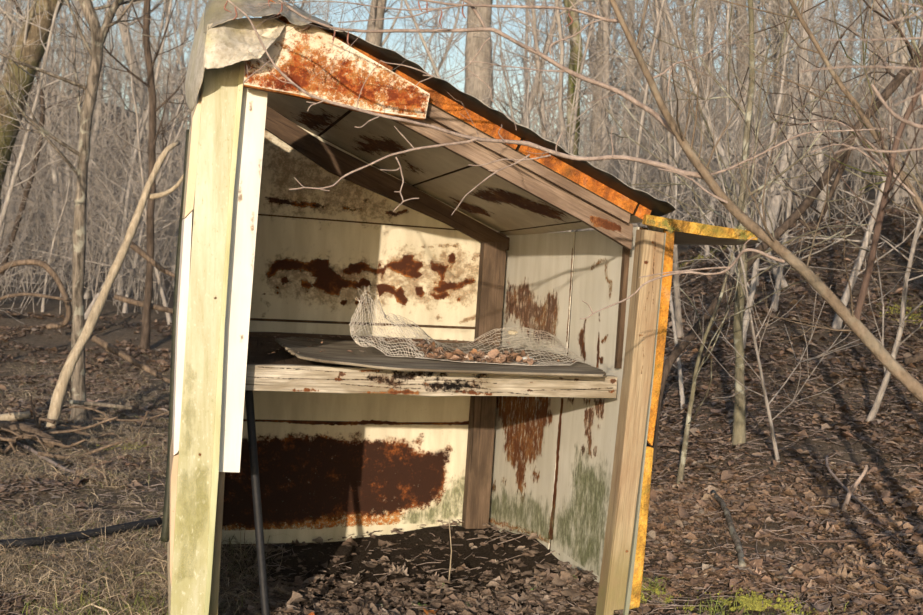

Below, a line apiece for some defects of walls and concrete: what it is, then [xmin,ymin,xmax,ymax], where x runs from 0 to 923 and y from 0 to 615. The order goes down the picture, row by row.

rust [245,26,429,132]
rust [449,186,568,223]
rust [264,244,475,314]
rust [504,248,586,361]
rust [596,334,608,368]
rust [222,419,469,531]
rust [489,396,604,544]